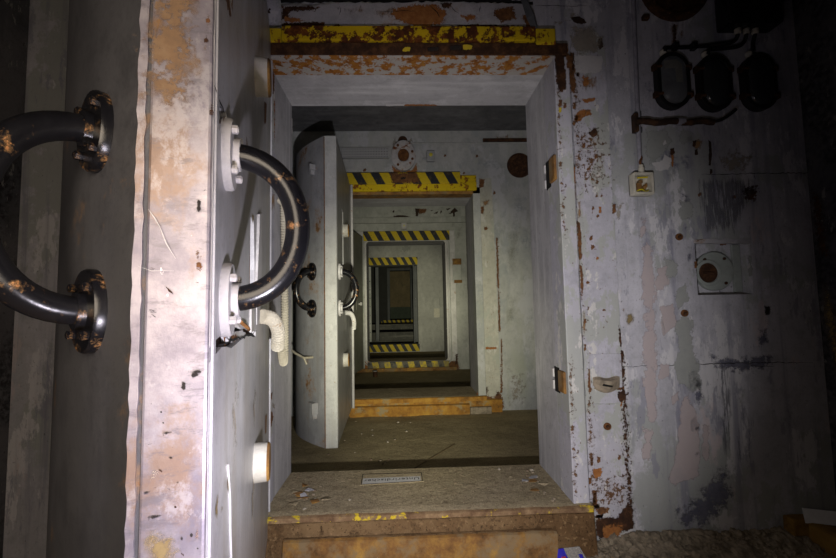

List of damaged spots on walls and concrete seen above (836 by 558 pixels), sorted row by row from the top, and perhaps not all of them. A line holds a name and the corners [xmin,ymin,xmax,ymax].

rust [493,6,535,26]
rust [554,53,615,351]
rust [569,325,634,540]
peeling [640,219,678,460]
peeling [674,284,702,393]
damp [711,331,772,449]
damp [676,473,733,526]